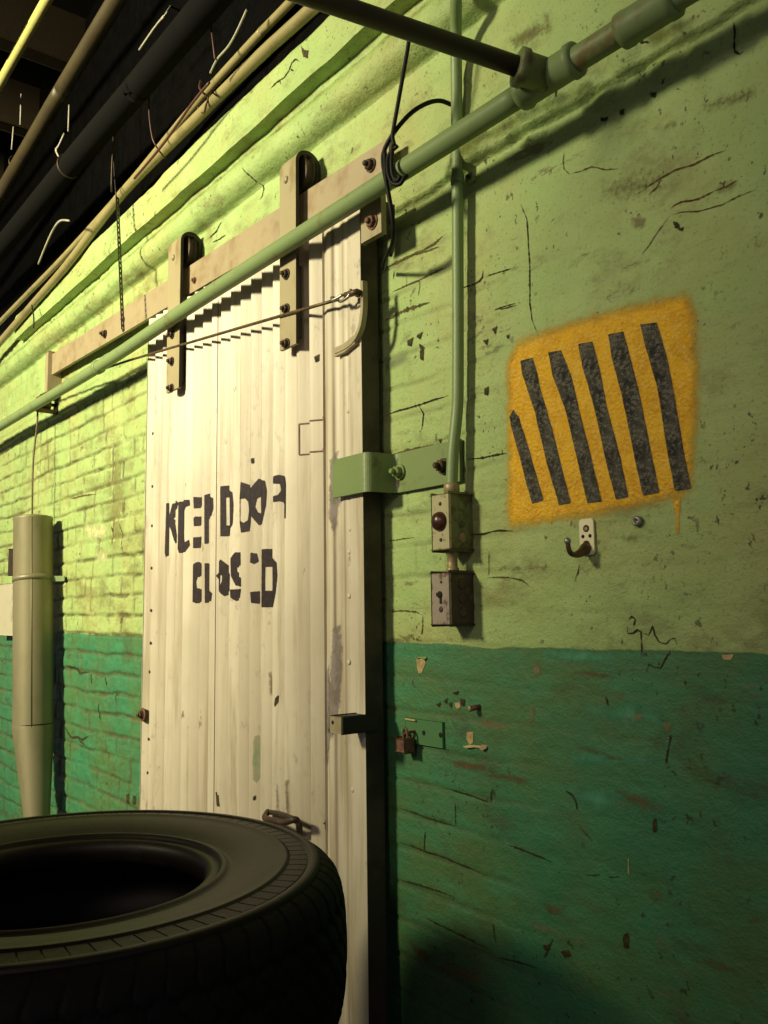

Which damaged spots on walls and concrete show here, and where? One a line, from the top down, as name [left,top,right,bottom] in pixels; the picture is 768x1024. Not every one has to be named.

crack [635,150,756,252]
crack [386,234,448,320]
crack [464,206,537,332]
crack [388,395,448,454]
peeling [416,656,427,673]
peeling [437,691,465,709]
crack [627,615,677,686]
peeling [462,732,487,751]